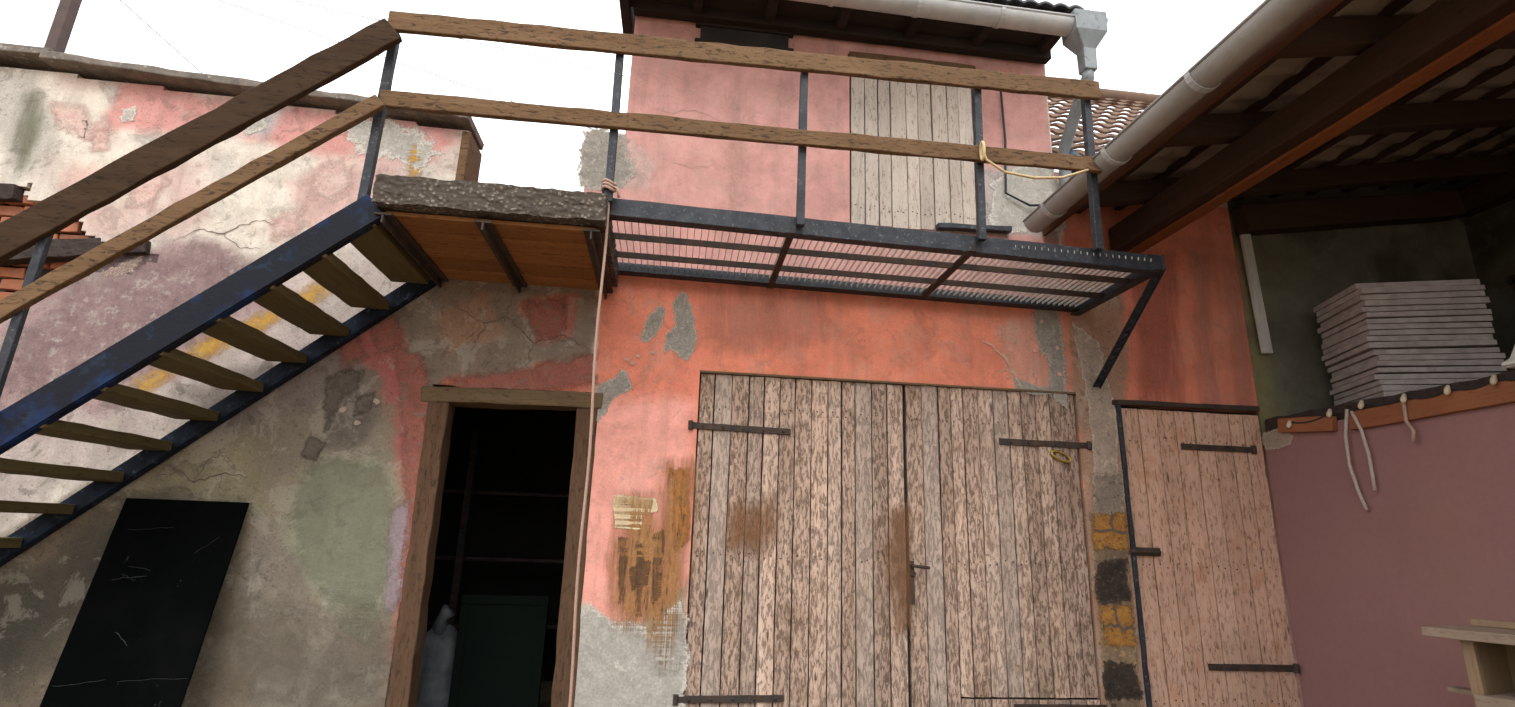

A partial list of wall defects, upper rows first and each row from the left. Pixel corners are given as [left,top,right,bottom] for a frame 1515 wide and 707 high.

spalling [0,183,36,223]
peeling [49,101,111,151]
peeling [128,174,170,207]
peeling [271,160,353,241]
peeling [576,128,638,191]
spalling [0,222,104,300]
spalling [102,241,154,279]
peeling [451,289,698,422]
peeling [301,317,428,612]
peeling [574,601,691,707]